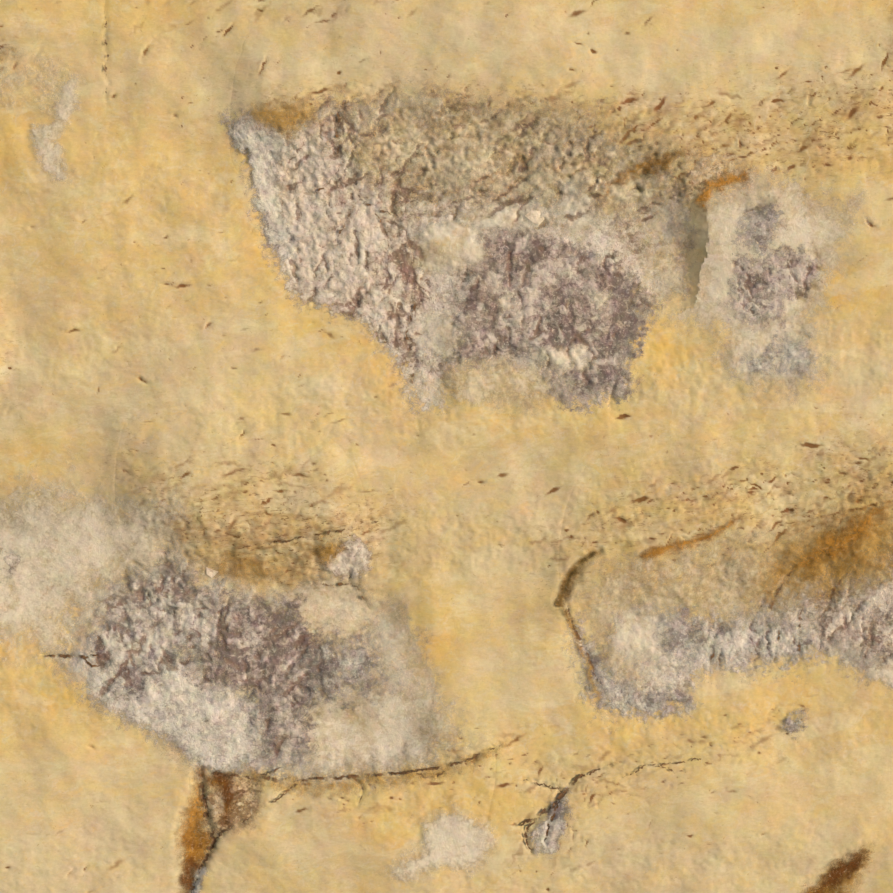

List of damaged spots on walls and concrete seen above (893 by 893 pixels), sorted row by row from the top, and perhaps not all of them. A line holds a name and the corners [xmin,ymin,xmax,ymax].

leakage [0,485,183,649]
crack [567,608,596,676]
rust [178,769,303,893]
crack [191,748,494,893]
crack [515,768,600,853]
crack [622,758,701,778]
rust [808,849,872,893]